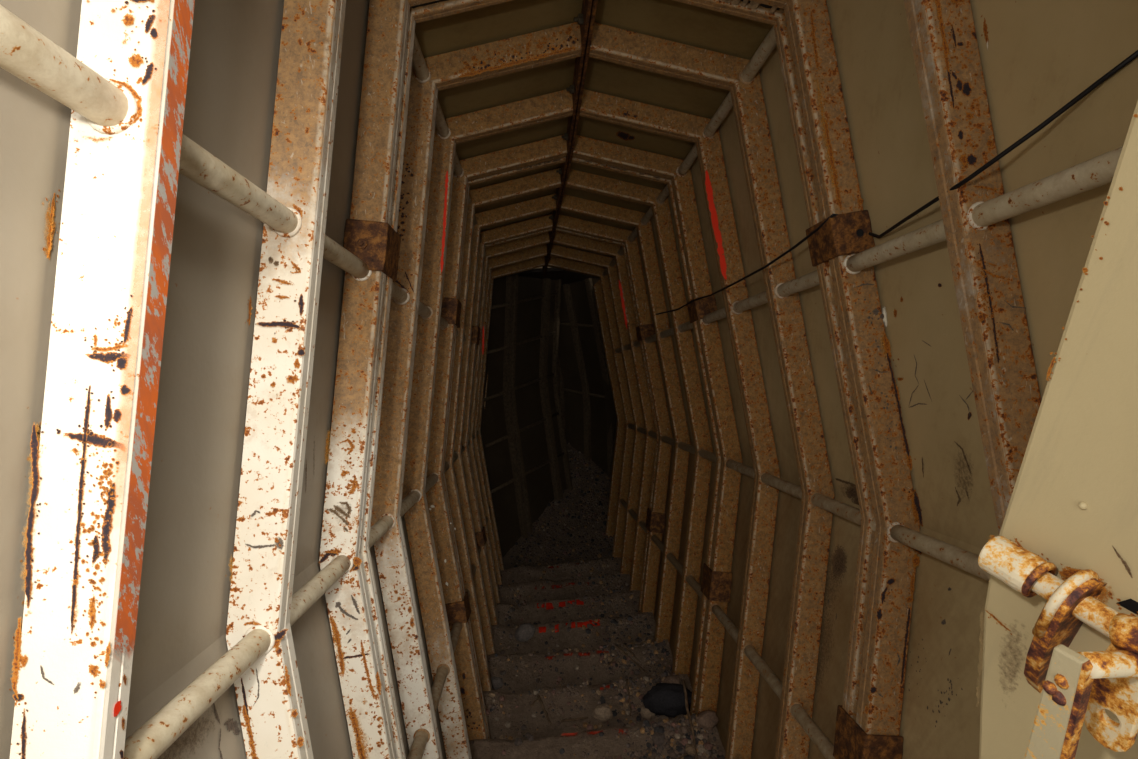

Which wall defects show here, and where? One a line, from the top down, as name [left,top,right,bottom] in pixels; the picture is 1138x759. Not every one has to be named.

corrosion [109,0,158,127]
corrosion [935,0,993,169]
corrosion [42,189,63,260]
corrosion [84,295,133,371]
corrosion [245,257,305,403]
corrosion [325,424,360,499]
corrosion [9,384,131,759]
corrosion [318,546,342,563]
corrosion [241,678,258,759]
corrosion [273,629,298,717]
corrosion [329,611,389,759]
corrosion [1060,660,1094,759]